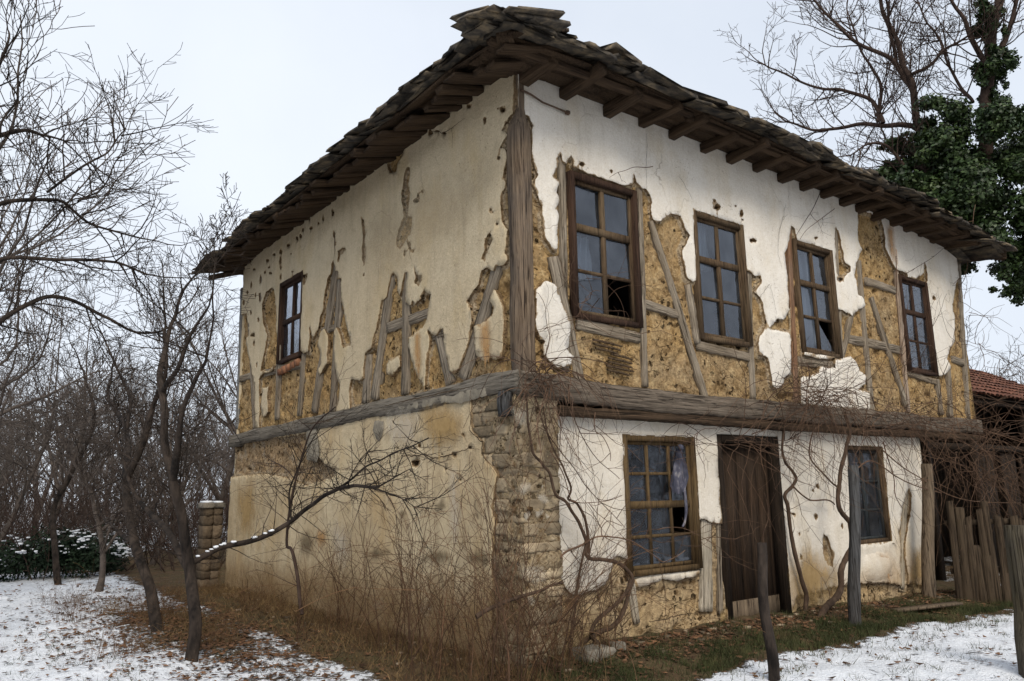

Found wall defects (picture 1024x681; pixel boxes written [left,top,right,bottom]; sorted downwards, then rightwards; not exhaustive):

spalling [390,153,412,247]
spalling [531,157,973,419]
spalling [233,235,512,485]
spalling [562,523,726,648]
spalling [823,536,831,565]